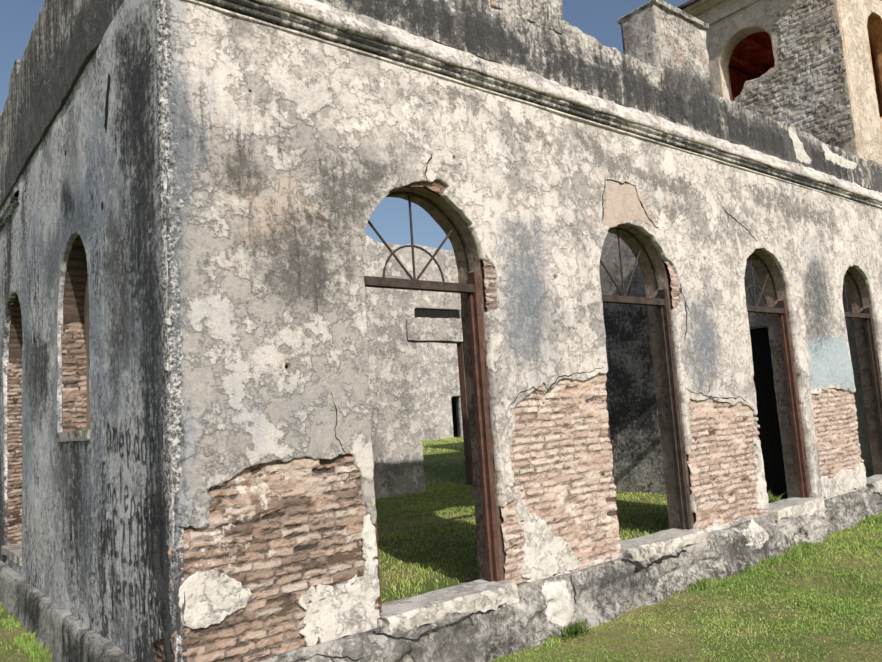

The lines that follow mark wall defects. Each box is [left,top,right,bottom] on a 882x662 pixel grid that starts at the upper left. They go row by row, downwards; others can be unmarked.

damp [347,0,452,36]
damp [464,2,528,64]
damp [543,26,784,156]
peeling [574,129,706,227]
damp [106,10,205,541]
spalling [152,0,382,662]
crack [506,367,603,418]
spalling [501,373,622,630]
spalling [687,398,769,550]
spalling [812,388,868,498]
crack [296,653,363,662]
crack [373,602,506,662]